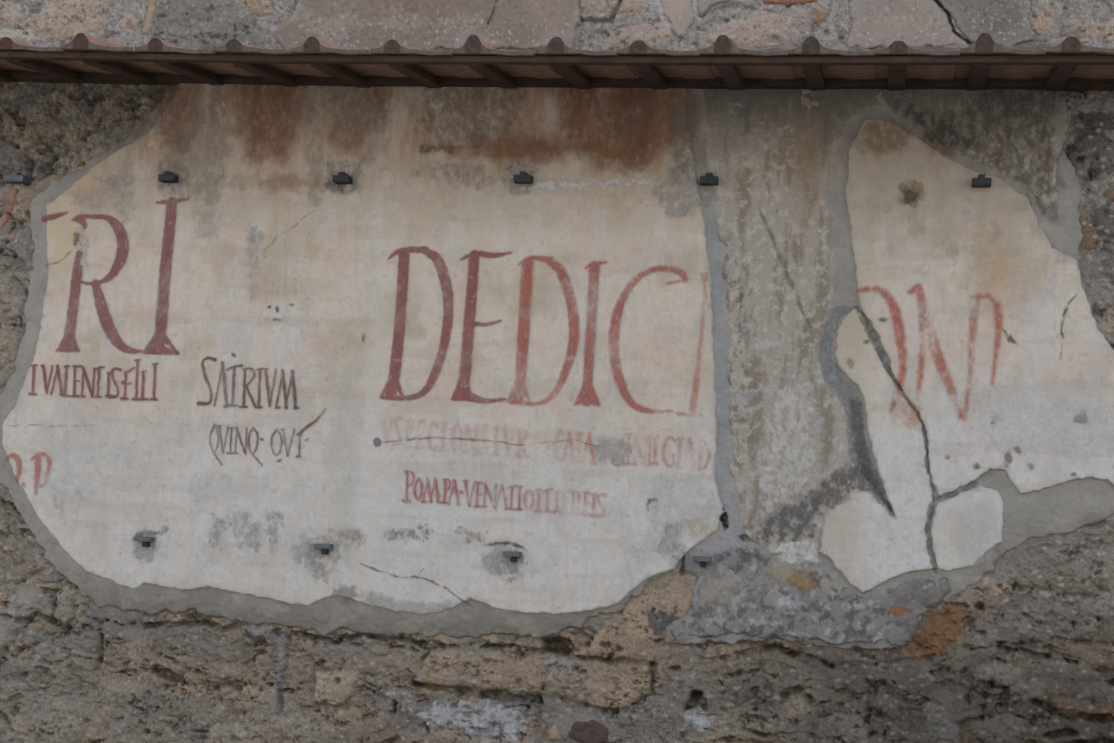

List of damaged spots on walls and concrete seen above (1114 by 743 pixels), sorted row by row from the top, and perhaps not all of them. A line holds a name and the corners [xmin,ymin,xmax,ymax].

crack [934,0,972,45]
damp [441,104,716,216]
spalling [899,181,924,207]
spalling [820,306,893,516]
crack [854,306,977,573]
spalling [720,507,729,529]
crack [362,564,470,605]